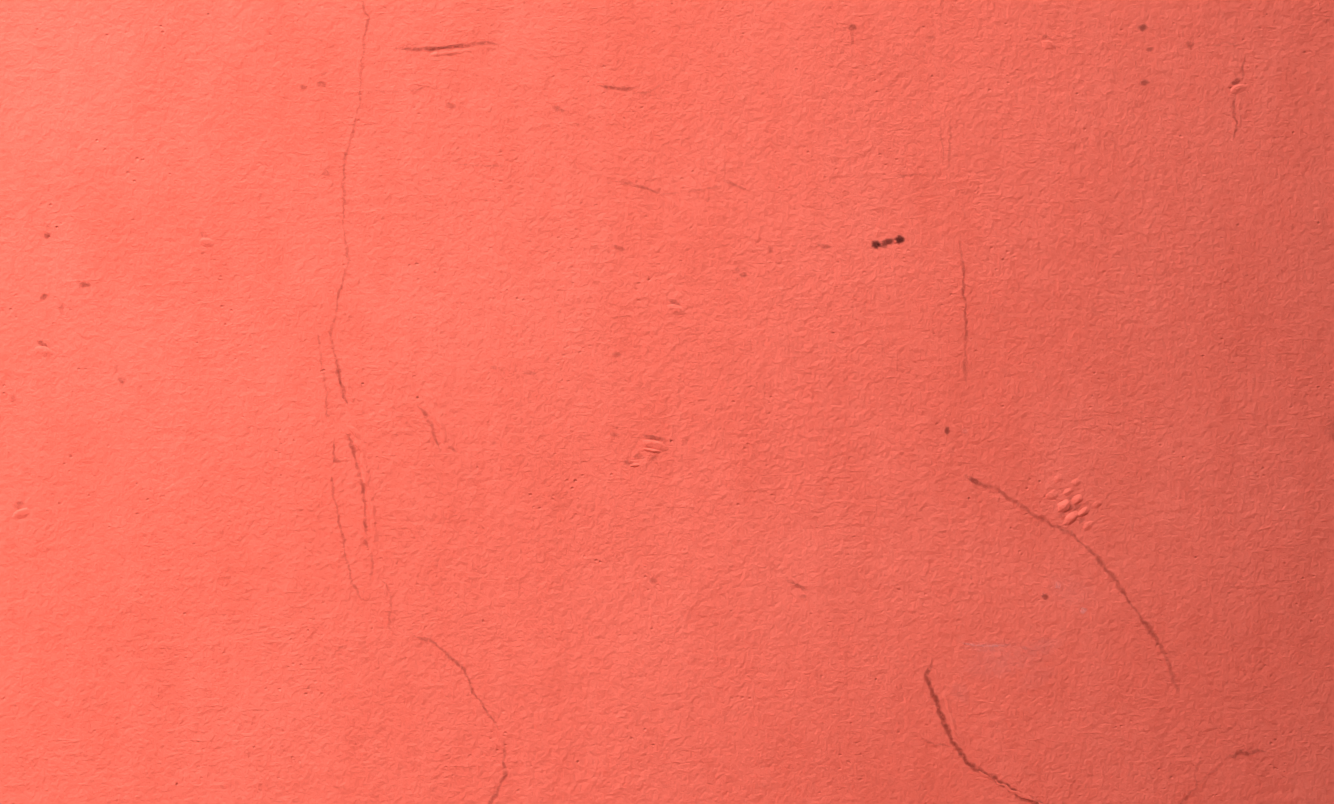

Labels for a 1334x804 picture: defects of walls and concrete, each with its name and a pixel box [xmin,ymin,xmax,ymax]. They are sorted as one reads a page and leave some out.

crack [931,689,1044,804]